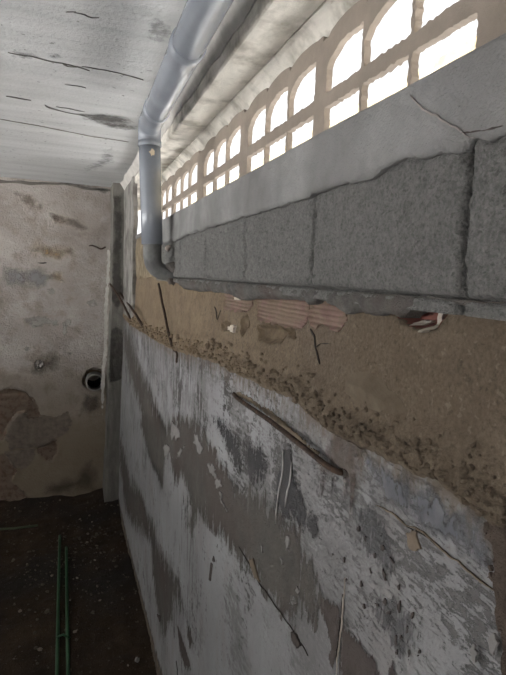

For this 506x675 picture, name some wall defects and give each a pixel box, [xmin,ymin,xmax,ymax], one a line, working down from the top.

crack [8,52,143,80]
crack [0,96,134,142]
crack [410,95,502,138]
spalling [157,283,178,363]
flaking render [221,293,348,345]
spalling [397,312,448,332]
spalling [0,388,40,440]
rust [232,392,362,514]
peeling [119,329,380,675]
crack [376,505,494,591]
crack [239,547,308,656]